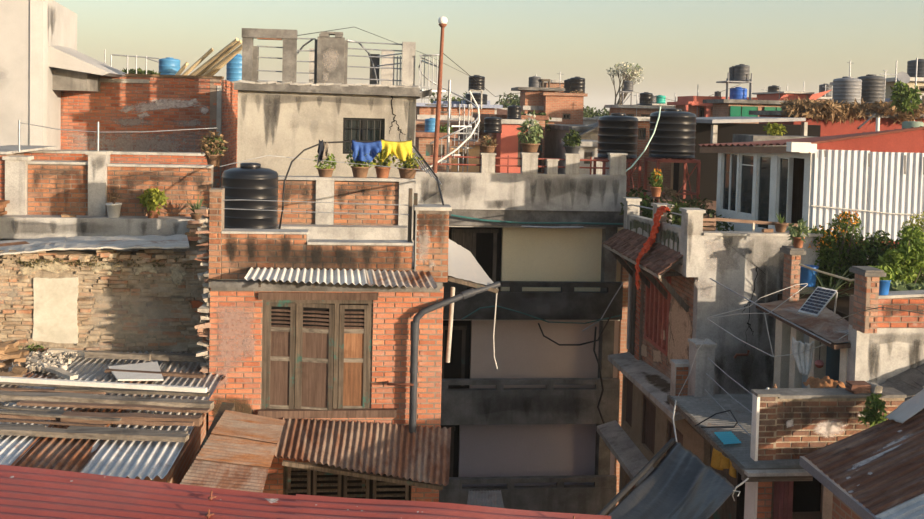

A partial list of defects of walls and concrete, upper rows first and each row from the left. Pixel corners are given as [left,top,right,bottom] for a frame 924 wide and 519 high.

flaking render [121,99,208,118]
crack [389,96,406,141]
damp [228,239,400,271]
crack [742,266,758,343]